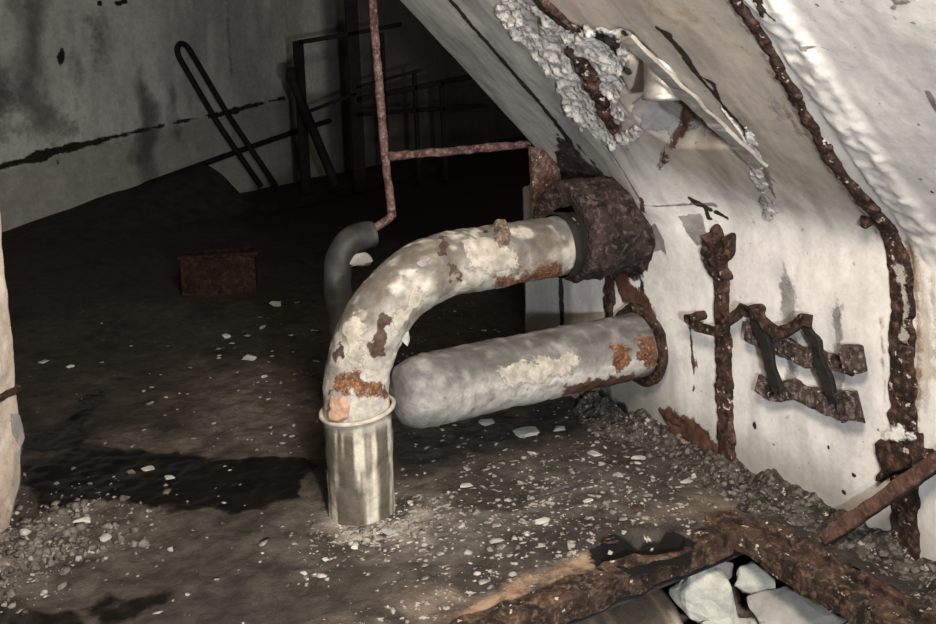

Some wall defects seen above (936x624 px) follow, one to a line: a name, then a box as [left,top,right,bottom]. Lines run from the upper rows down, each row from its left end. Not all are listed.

damp [137,87,156,165]
corrosion [689,327,698,373]
corrosion [905,239,933,431]
corrosion [0,381,22,402]
corrosion [659,406,718,454]
corrosion [912,447,935,467]
corrosion [457,553,595,617]